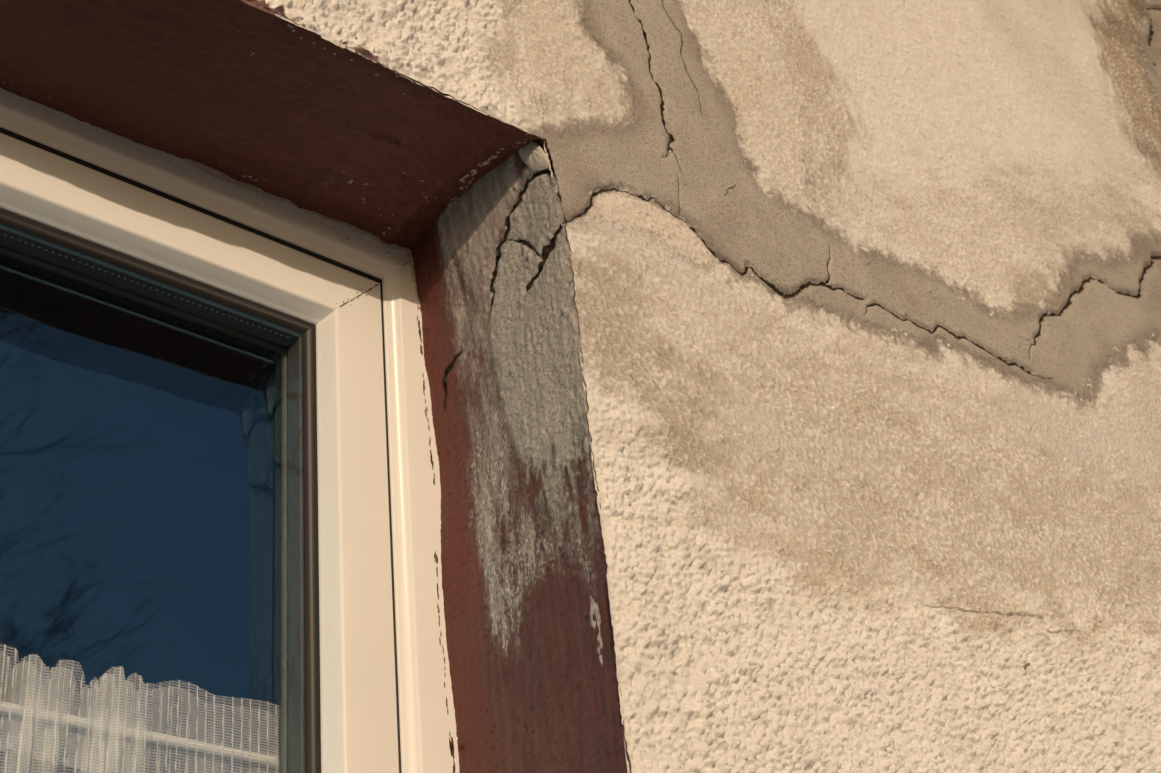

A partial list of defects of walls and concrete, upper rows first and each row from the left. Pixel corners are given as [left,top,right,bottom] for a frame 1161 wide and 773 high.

crack [489,0,1161,379]
peeling [419,133,594,651]
peeling [590,596,603,665]